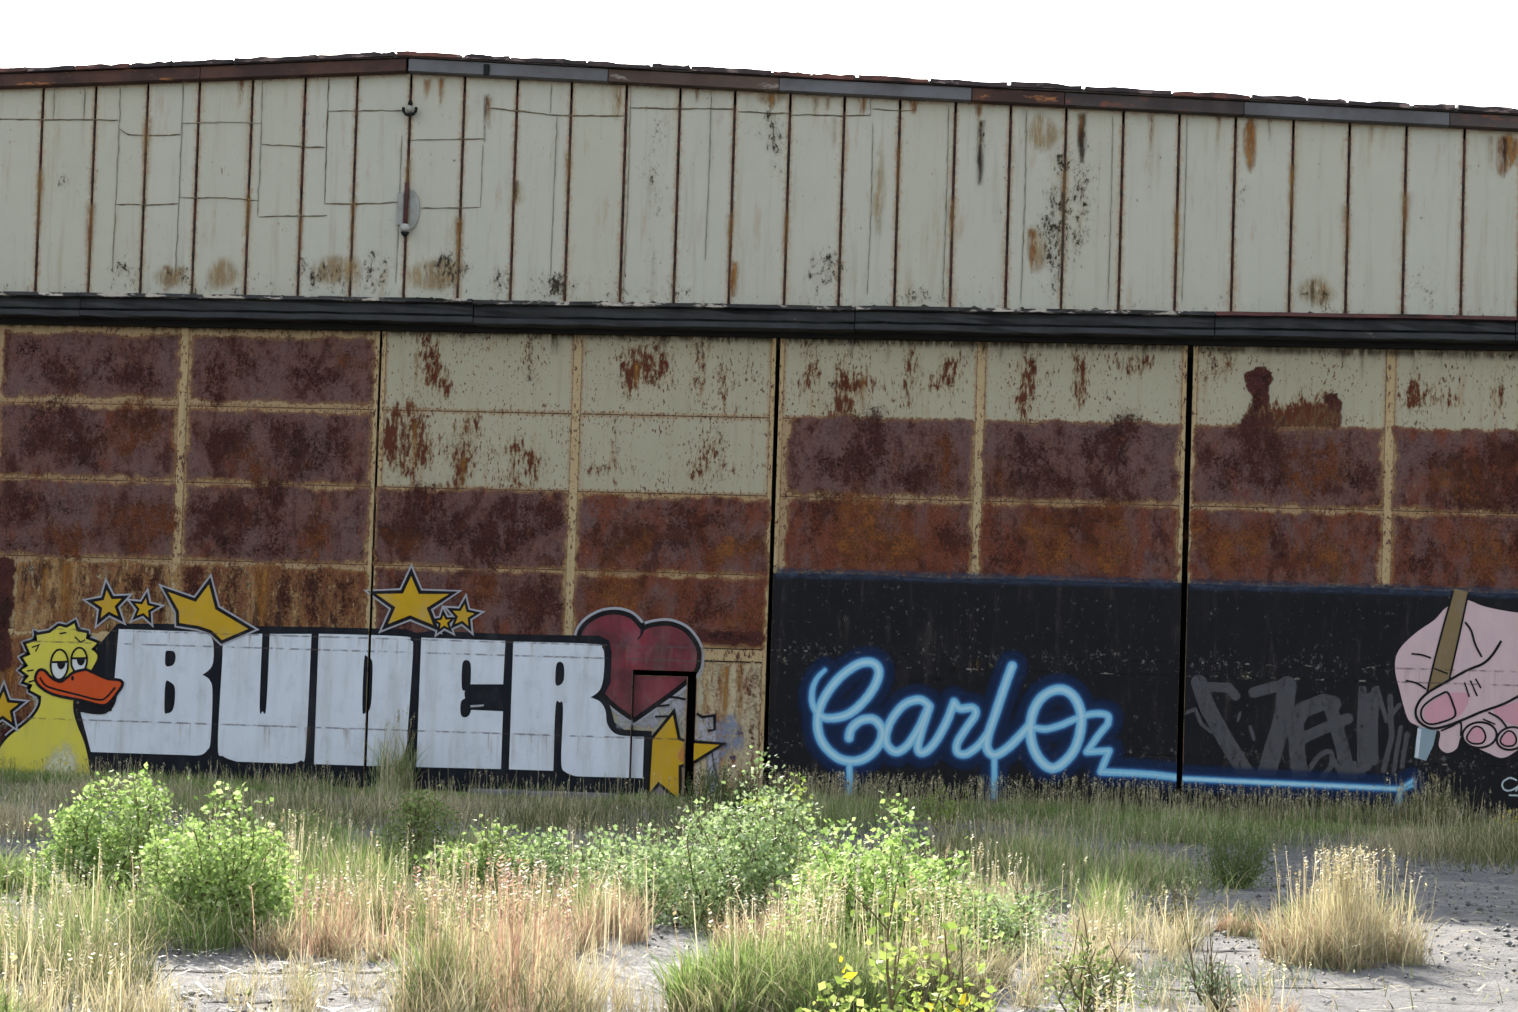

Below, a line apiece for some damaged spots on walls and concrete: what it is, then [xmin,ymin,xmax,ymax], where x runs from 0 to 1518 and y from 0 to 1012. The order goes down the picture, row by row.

mould [1037,133,1100,295]
corrosion [1244,119,1256,166]
corrosion [1498,135,1517,174]
corrosion [0,329,1518,798]